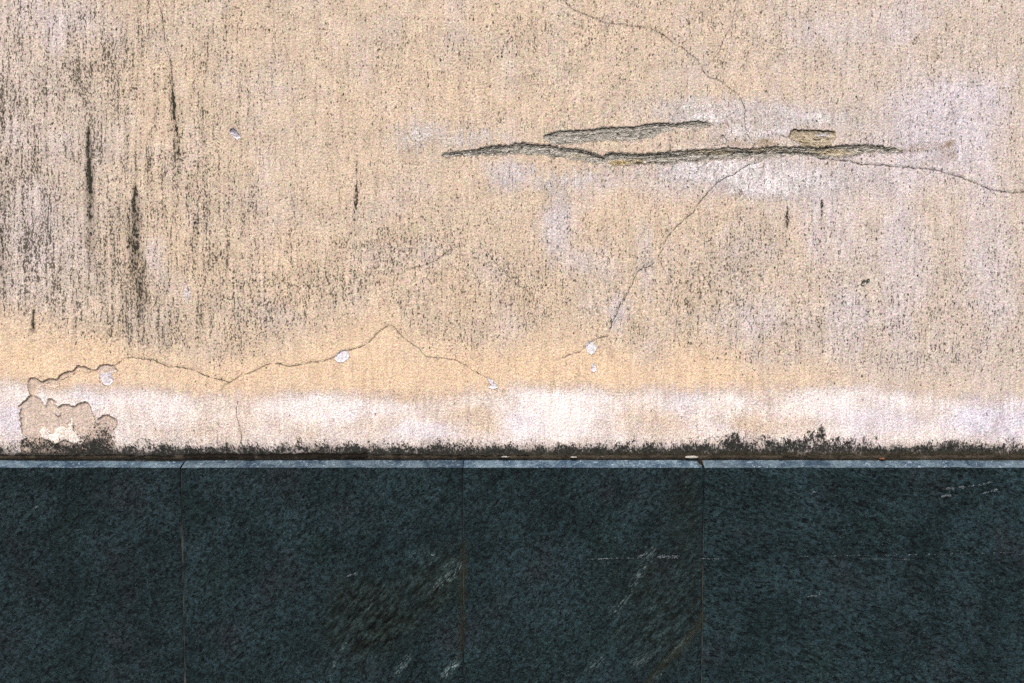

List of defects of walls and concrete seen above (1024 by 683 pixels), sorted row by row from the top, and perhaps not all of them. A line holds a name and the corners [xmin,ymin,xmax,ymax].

leakage [84,127,95,258]
leakage [171,77,181,155]
crack [566,2,750,140]
spalling [441,120,903,167]
crack [815,154,1024,193]
leakage [126,183,147,341]
crack [552,161,761,362]
peeling [18,364,118,453]
crack [117,324,490,445]
leakage [0,381,1024,468]